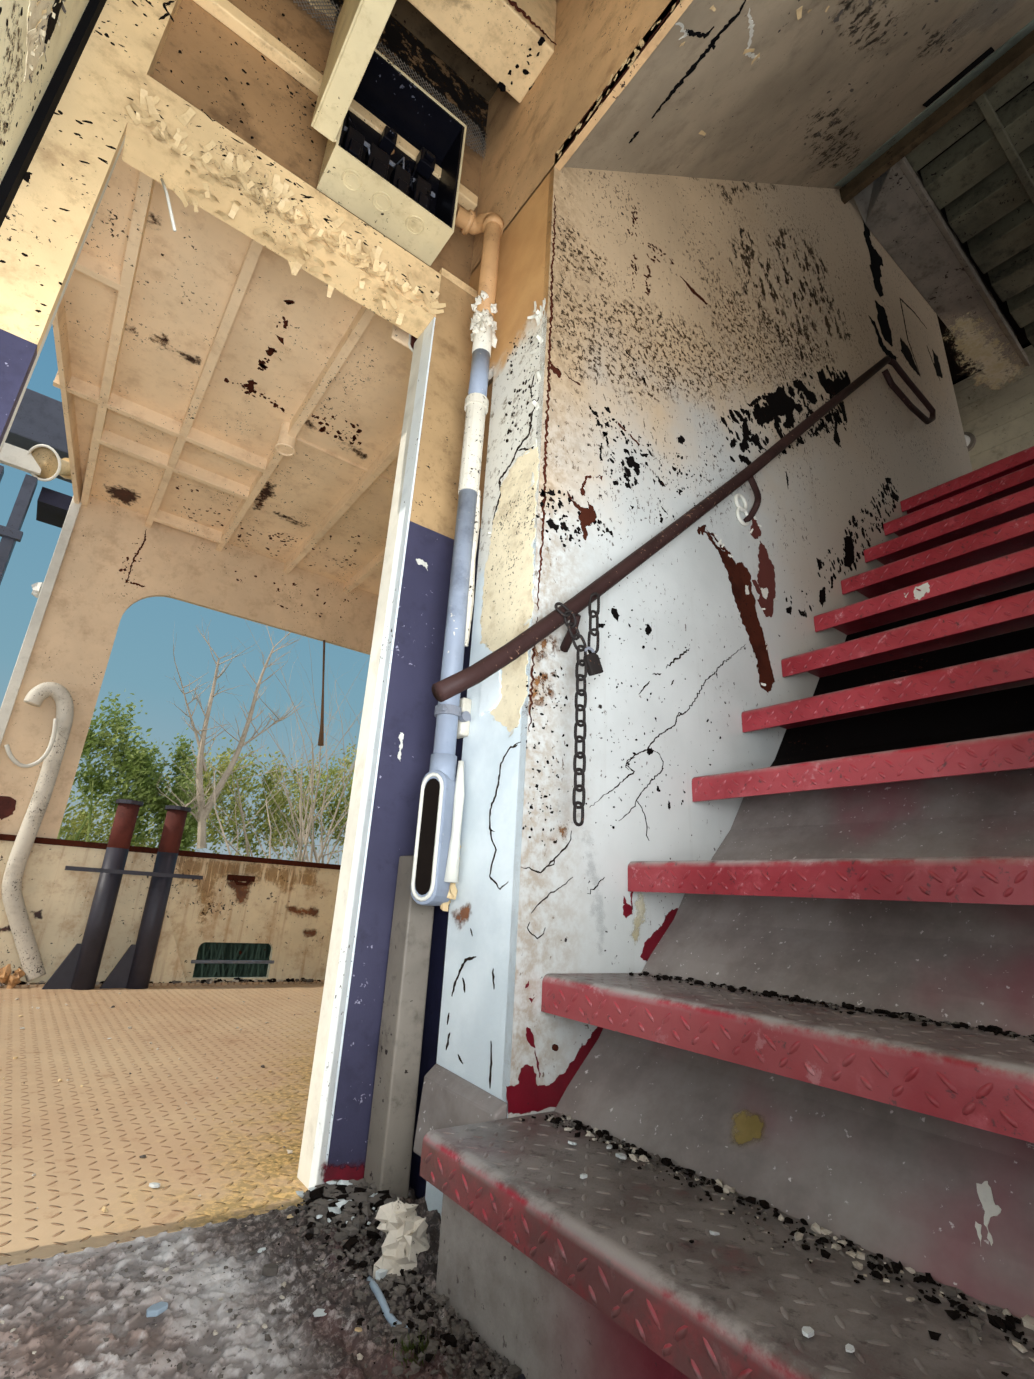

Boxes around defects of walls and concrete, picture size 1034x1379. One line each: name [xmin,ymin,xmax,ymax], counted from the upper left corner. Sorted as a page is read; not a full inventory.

peeling [0,0,66,111]
peeling [94,0,167,52]
peeling [307,0,336,20]
crack [559,0,760,159]
peeling [42,69,446,325]
peeling [589,365,851,523]
rust [0,796,16,820]
crack [489,645,745,939]
peeling [975,1181,1001,1246]